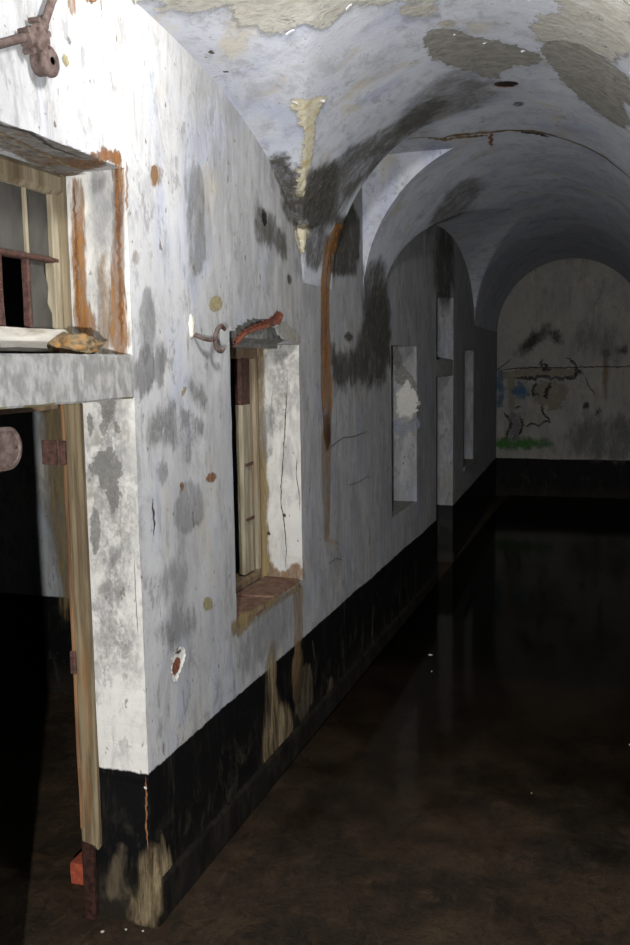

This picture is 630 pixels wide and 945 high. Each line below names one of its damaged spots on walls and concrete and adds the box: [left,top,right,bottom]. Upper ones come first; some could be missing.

peeling [152,0,630,129]
peeling [290,95,327,201]
crack [411,130,630,178]
corrosion [0,124,129,355]
water stain [256,208,287,258]
water stain [270,80,483,387]
corrosion [320,223,344,547]
crack [497,360,629,394]